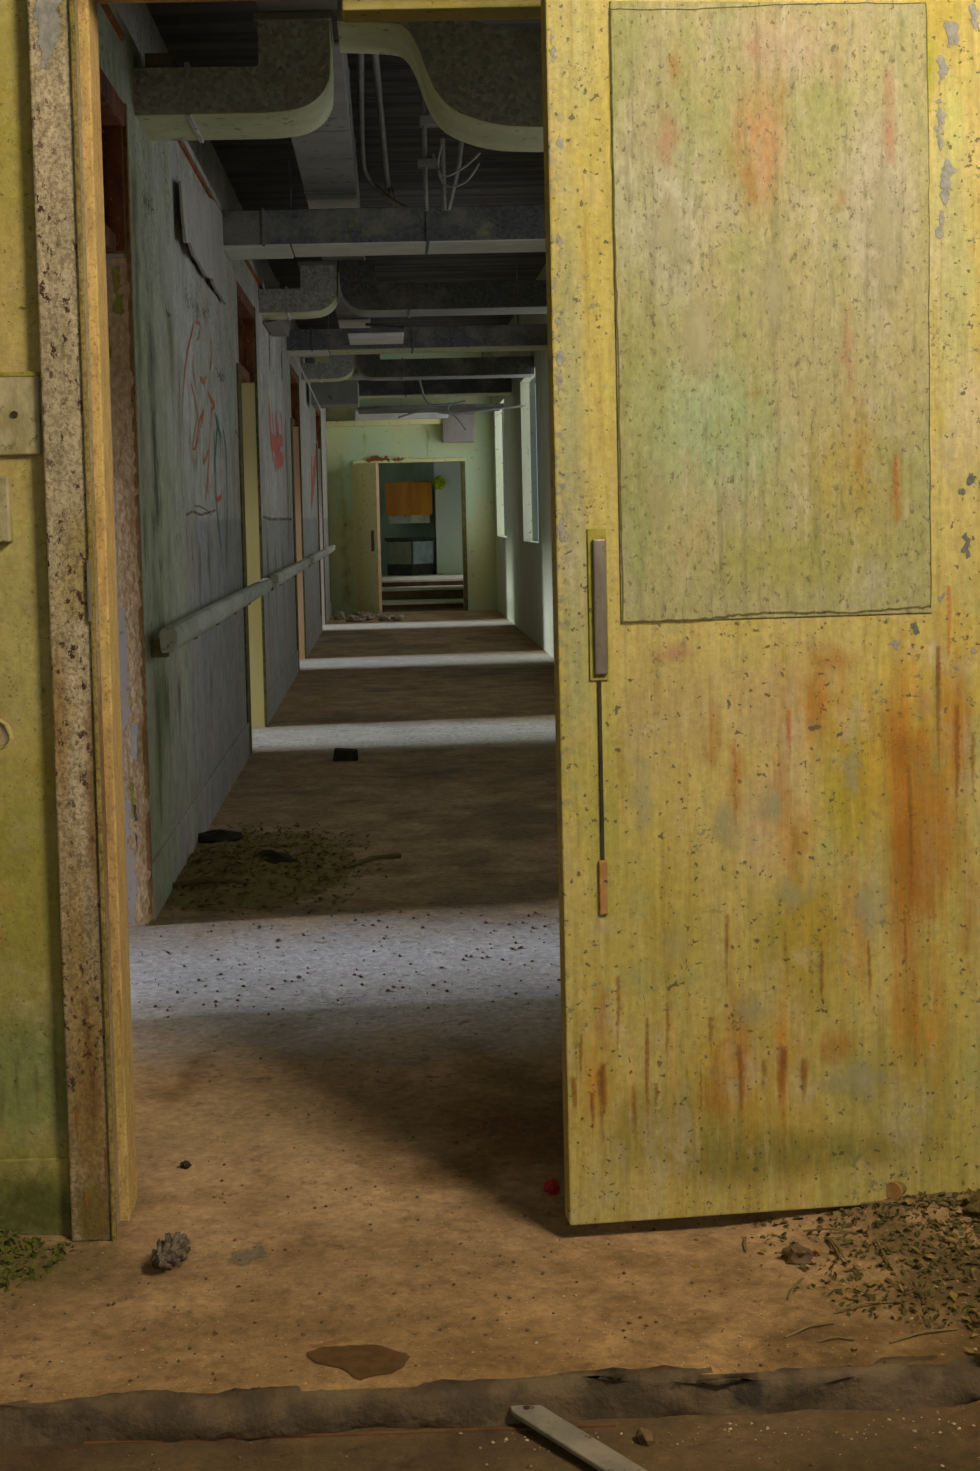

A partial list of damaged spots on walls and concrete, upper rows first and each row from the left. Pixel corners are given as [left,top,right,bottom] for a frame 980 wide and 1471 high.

peeling [934,0,980,239]
crack [188,253,219,299]
corrosion [937,647,975,796]
corrosion [572,1065,607,1119]
corrosion [765,1048,807,1084]